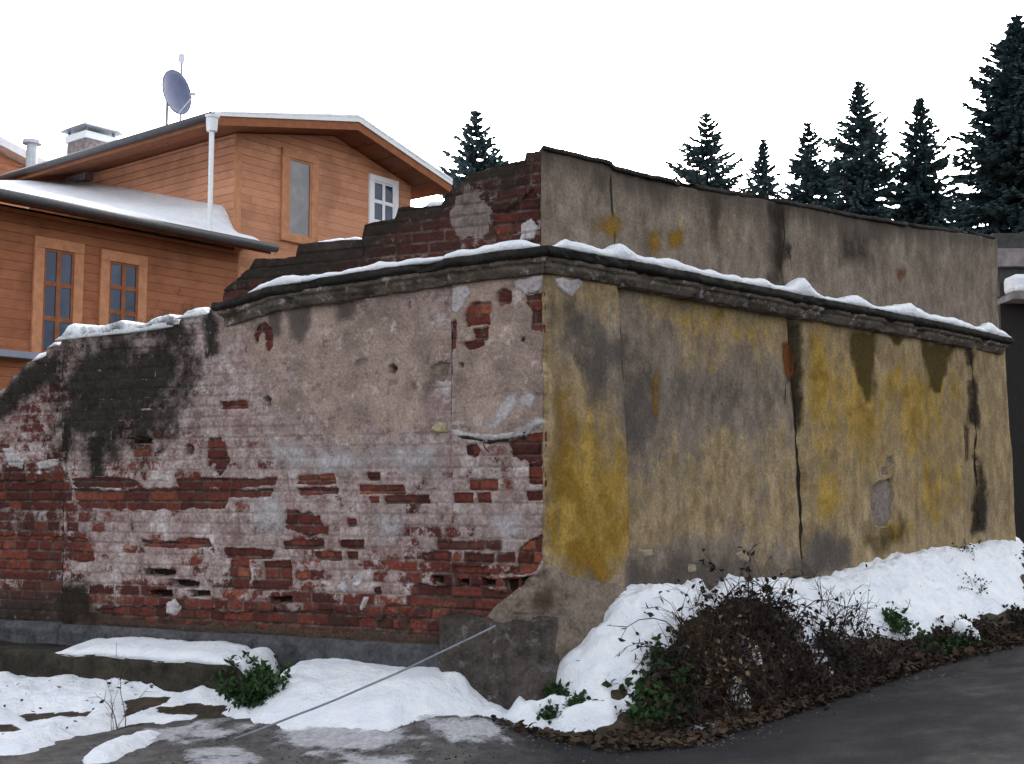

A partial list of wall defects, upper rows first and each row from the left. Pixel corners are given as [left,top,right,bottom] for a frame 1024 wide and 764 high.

peeling [449,189,540,241]
water stain [202,309,218,357]
spalling [451,275,546,350]
corrosion [782,342,796,381]
water stain [851,332,875,401]
spalling [0,438,277,511]
peeling [431,392,547,503]
crack [784,378,803,560]
water stain [922,343,987,534]
crack [964,410,978,495]
spalling [142,509,543,636]
water stain [628,533,851,587]